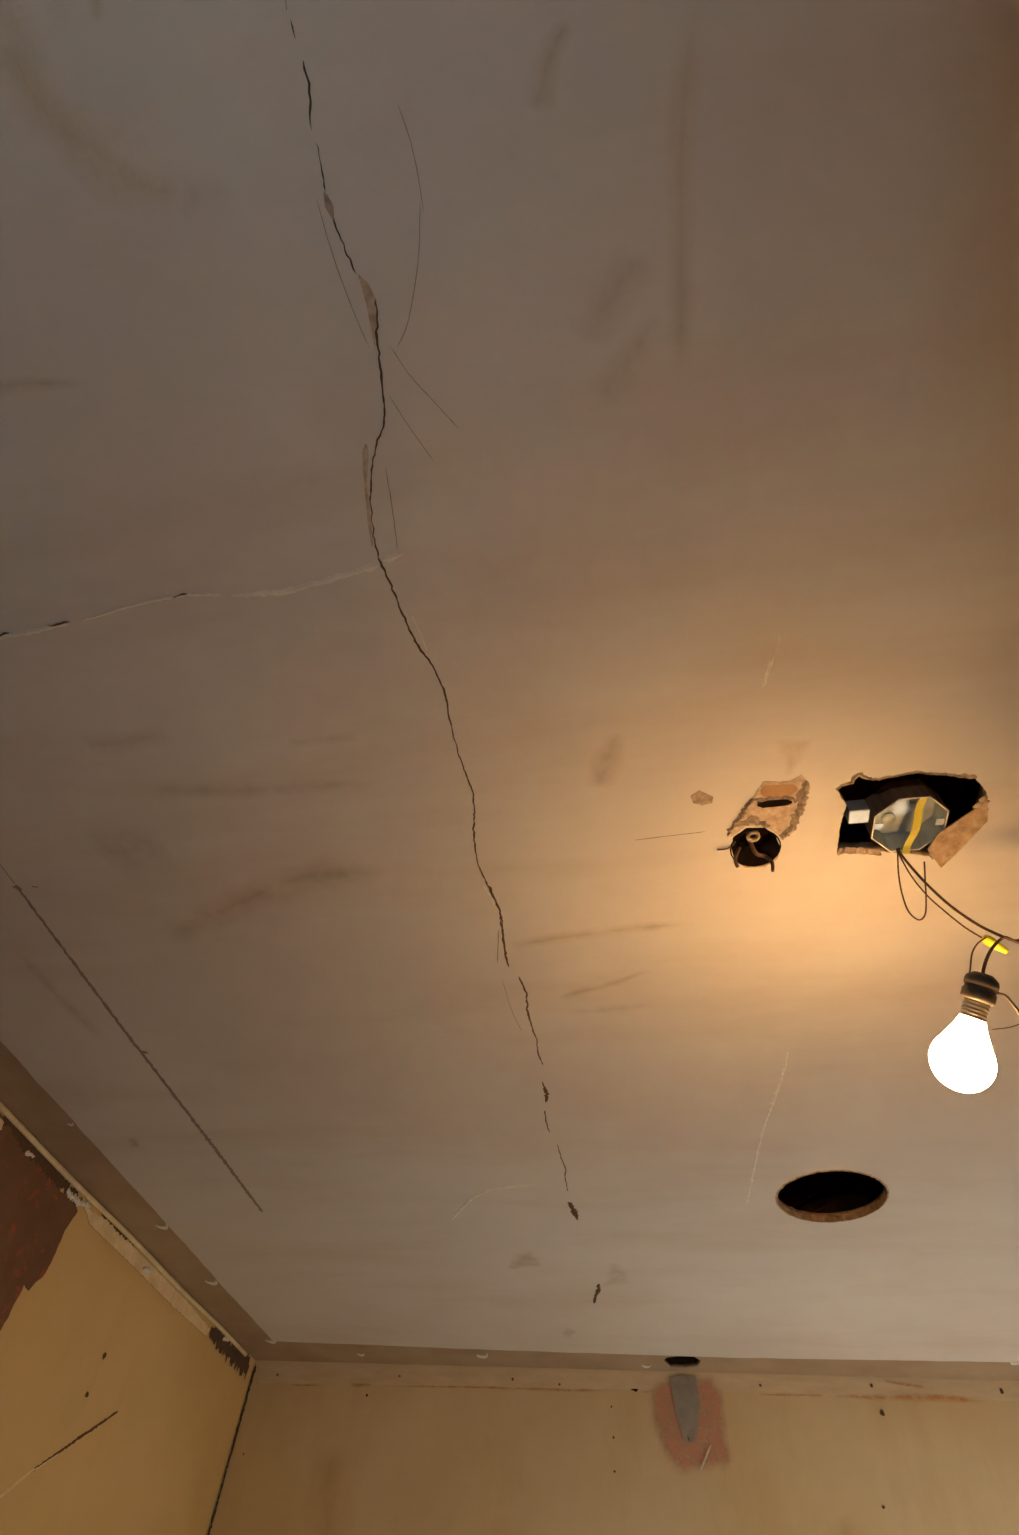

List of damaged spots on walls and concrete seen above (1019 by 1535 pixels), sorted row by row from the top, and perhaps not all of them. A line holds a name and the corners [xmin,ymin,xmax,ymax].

crack [0,0,579,1220]
spalling [691,790,713,806]
spalling [726,775,810,840]
spalling [837,847,881,856]
spalling [927,795,990,868]
peeling [0,1113,1019,1401]
crack [593,1284,601,1304]